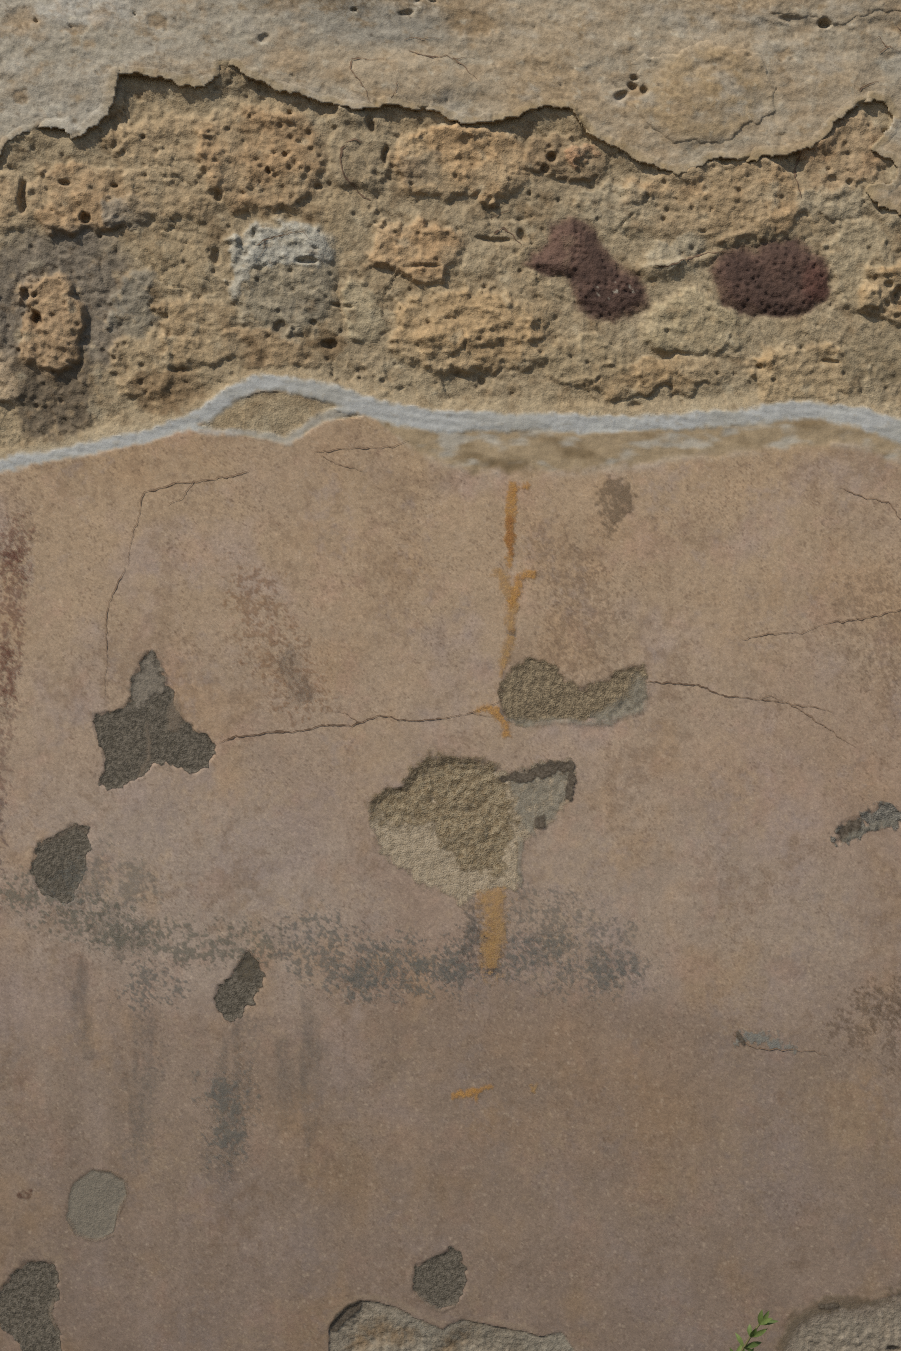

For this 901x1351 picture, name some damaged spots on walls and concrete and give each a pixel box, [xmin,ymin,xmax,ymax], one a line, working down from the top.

flaking render [0,57,901,460]
peeling [506,515,514,555]
spalling [477,568,648,736]
spalling [92,650,216,790]
crack [222,700,501,742]
crack [648,681,854,746]
spalling [30,823,92,904]
spalling [368,752,576,975]
spalling [214,952,265,1022]
spalling [0,1261,61,1351]
spalling [330,1300,362,1331]
spalling [412,1246,467,1309]